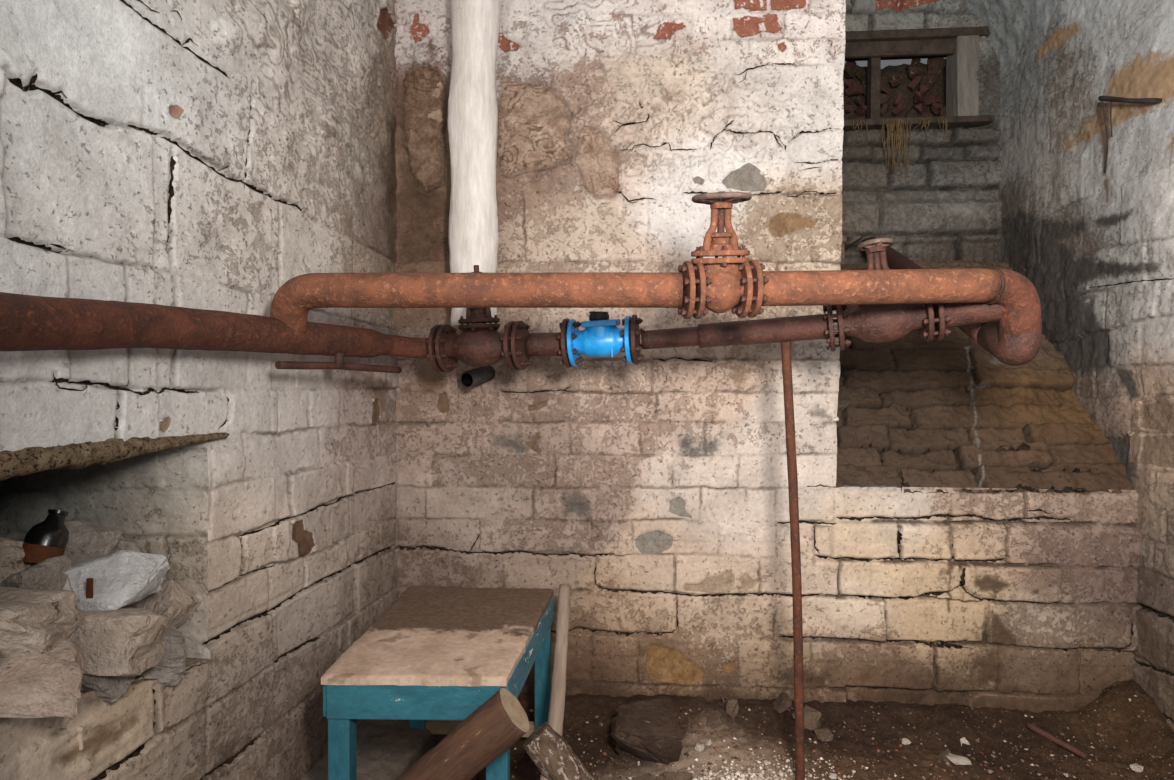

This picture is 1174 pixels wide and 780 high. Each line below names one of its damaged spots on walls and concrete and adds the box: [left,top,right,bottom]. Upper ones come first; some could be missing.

crack [121,0,231,79]
spalling [646,21,686,40]
spalling [732,0,811,52]
spalling [876,0,938,13]
corrosion [1064,53,1174,201]
crack [7,74,301,246]
crack [613,102,839,203]
damp [1097,210,1132,226]
crack [8,237,66,253]
damp [1085,263,1158,278]
damp [1118,370,1138,400]
peeling [288,518,318,557]